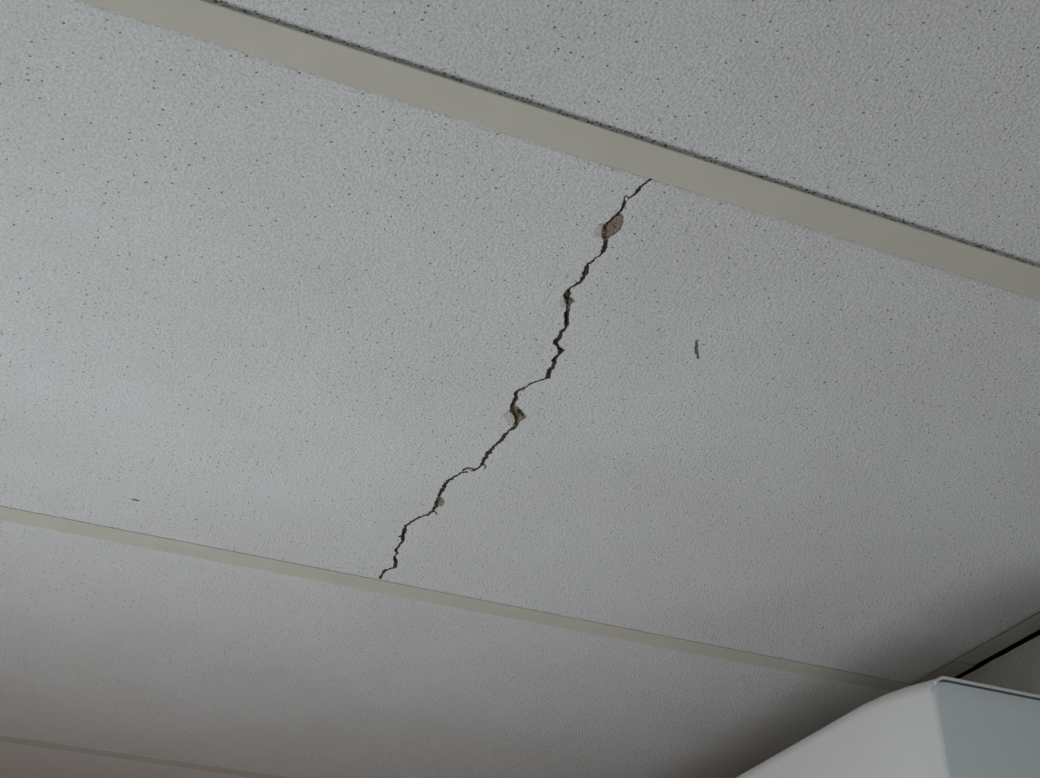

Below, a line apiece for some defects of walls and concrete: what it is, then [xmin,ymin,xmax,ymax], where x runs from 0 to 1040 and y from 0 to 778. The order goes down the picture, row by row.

crack [379,178,653,579]